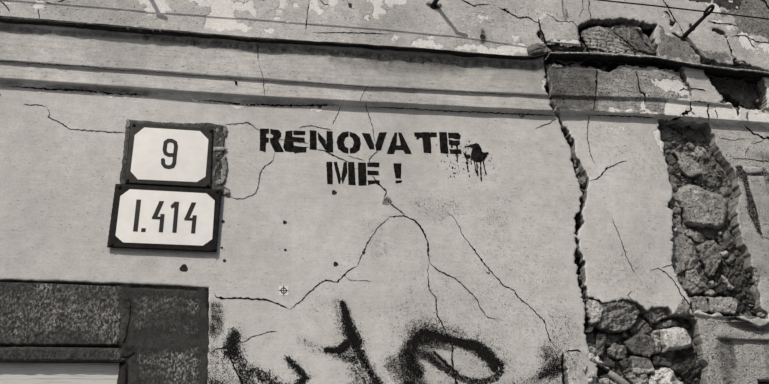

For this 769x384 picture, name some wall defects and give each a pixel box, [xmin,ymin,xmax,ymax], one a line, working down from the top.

peeling [138,0,172,16]
peeling [189,0,256,32]
peeling [264,0,338,33]
peeling [364,0,407,20]
peeling [411,35,443,49]
peeling [689,0,769,53]
crack [0,61,138,72]
crack [10,86,147,133]
crack [156,0,656,384]
spalling [455,22,769,384]